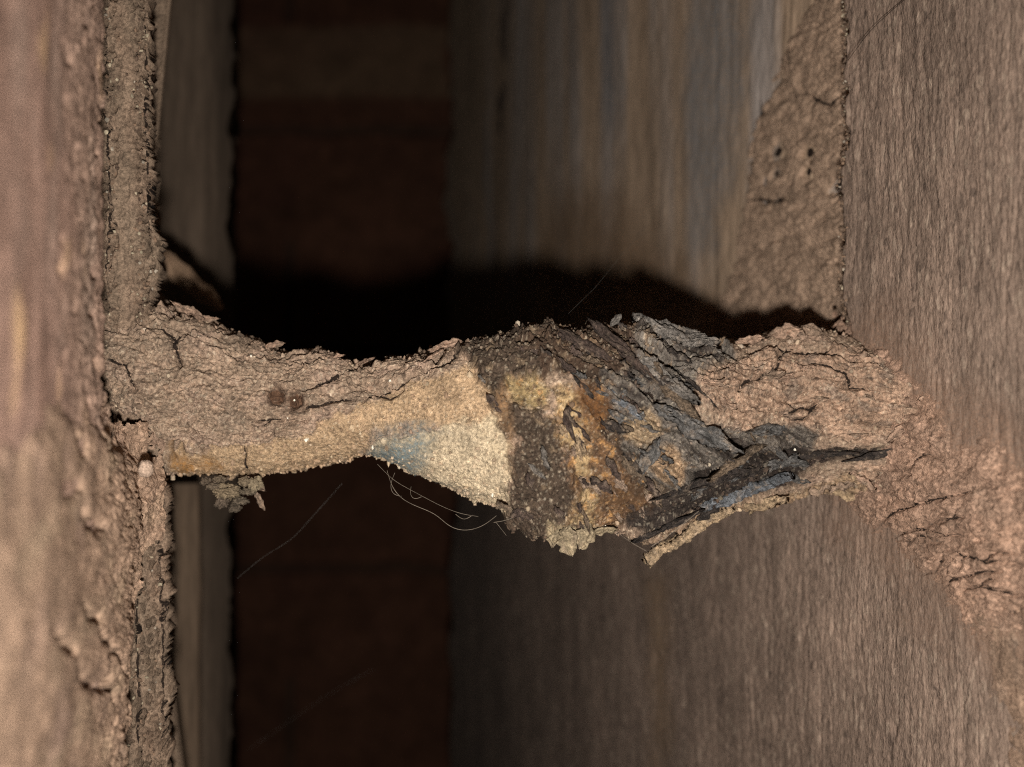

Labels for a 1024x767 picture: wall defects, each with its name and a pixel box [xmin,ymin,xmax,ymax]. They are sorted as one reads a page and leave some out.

crack [160,305,182,368]
crack [108,359,136,390]
crack [305,369,405,410]
peeling [477,374,504,412]
peeling [558,313,891,544]